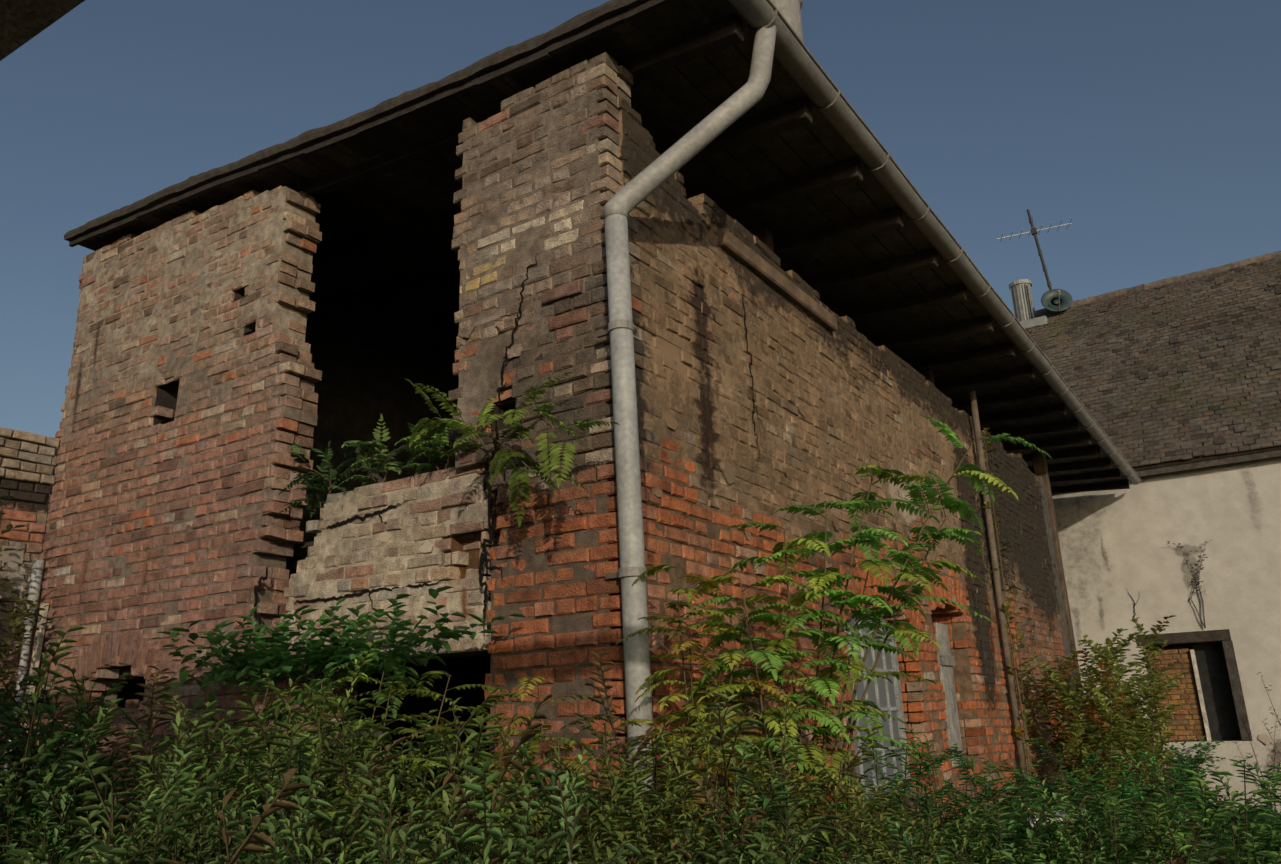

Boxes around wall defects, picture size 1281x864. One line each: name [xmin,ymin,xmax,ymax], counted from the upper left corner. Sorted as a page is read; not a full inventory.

crack [494,250,545,402]
crack [235,567,268,652]
crack [294,433,521,636]
leakage [954,431,1066,710]
peeling [1258,734,1281,787]